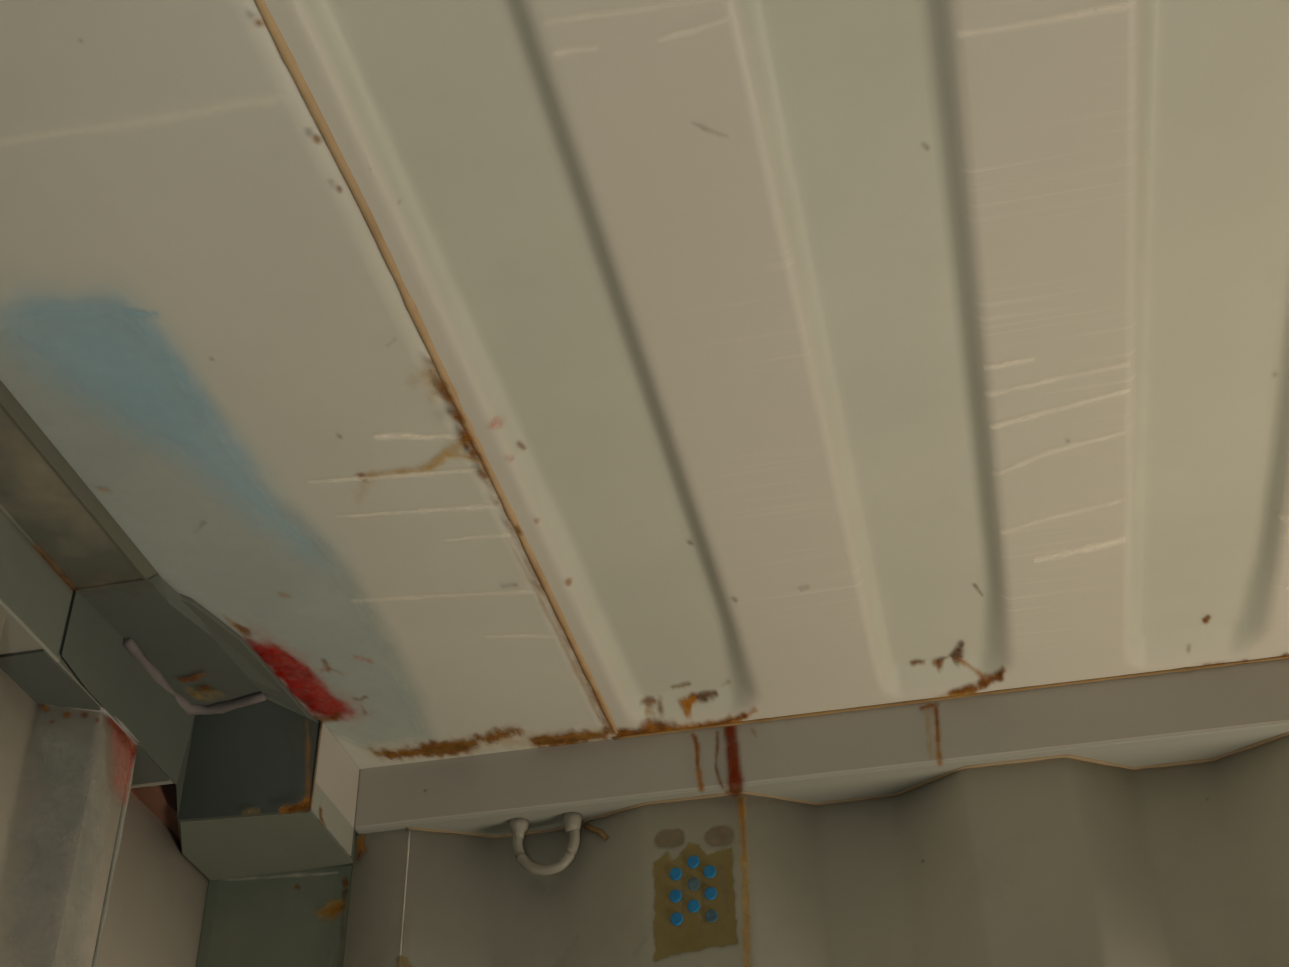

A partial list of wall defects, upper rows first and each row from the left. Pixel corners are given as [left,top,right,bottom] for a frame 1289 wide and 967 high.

corrosion [440,384,488,478]
corrosion [912,643,964,668]
corrosion [949,669,1005,696]
corrosion [920,704,941,765]
corrosion [375,684,749,967]